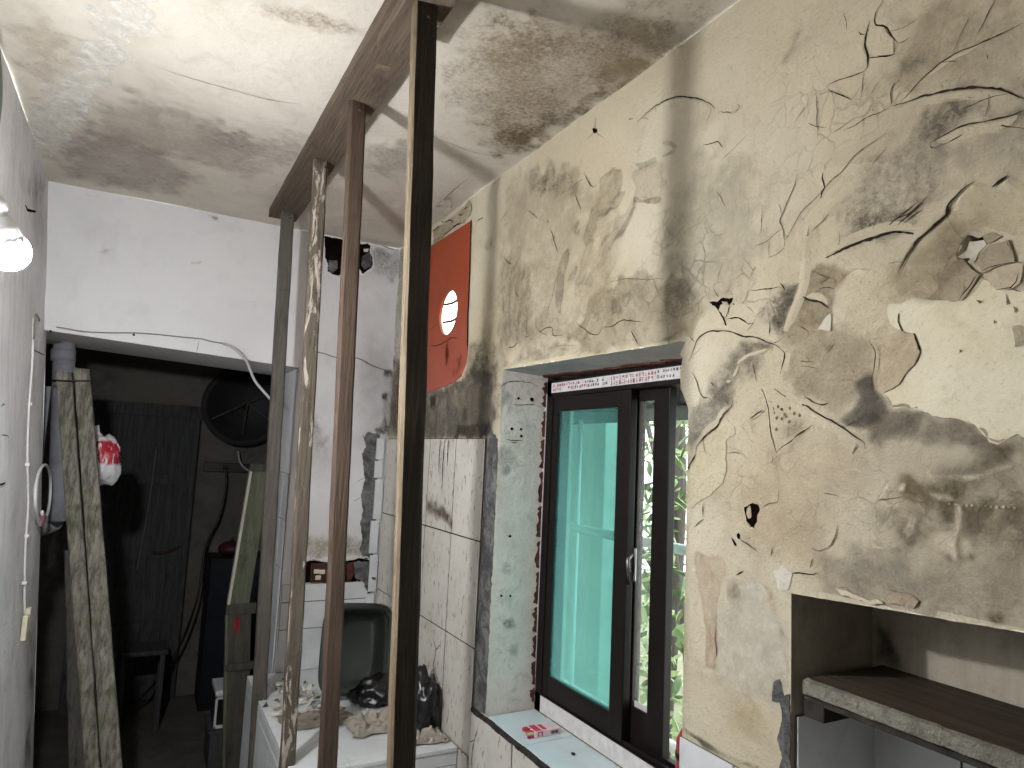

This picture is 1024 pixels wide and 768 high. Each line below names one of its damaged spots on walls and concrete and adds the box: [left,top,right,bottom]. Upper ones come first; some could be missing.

damp [472,21,670,156]
crack [629,92,745,160]
crack [433,180,640,348]
crack [680,0,1024,472]
spalling [818,178,1024,445]
damp [834,345,1012,450]
spalling [305,556,328,583]
peeling [345,432,380,594]
crack [794,525,838,575]
damp [886,474,1016,557]